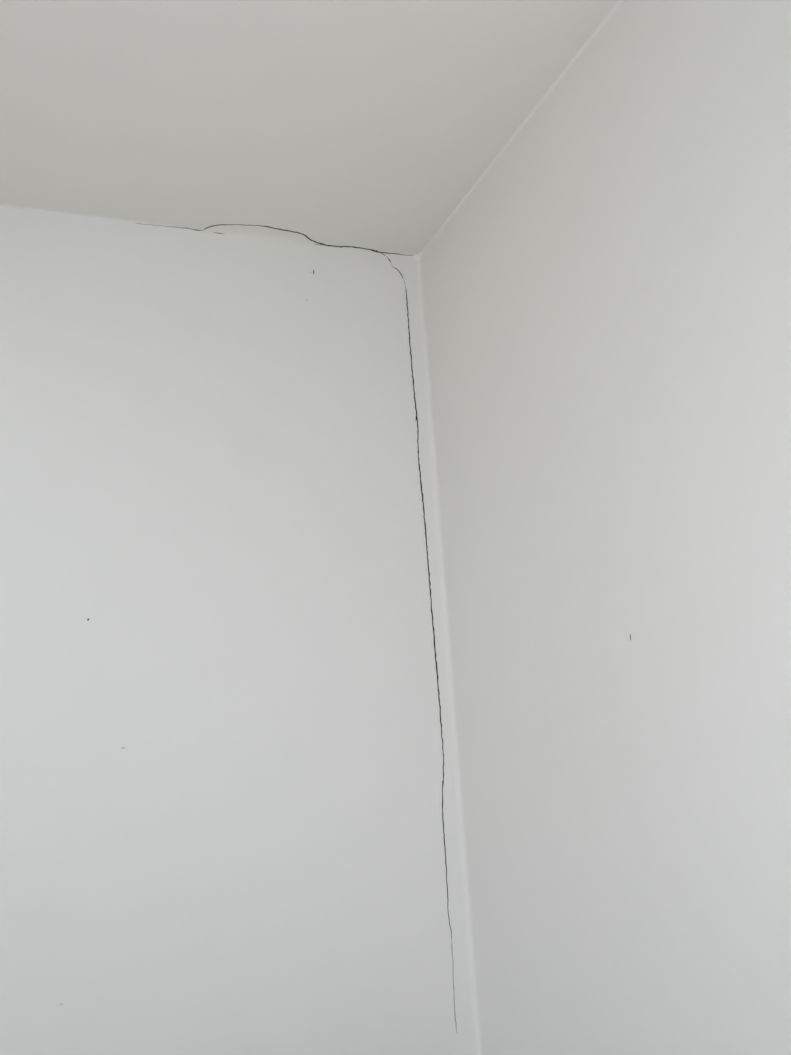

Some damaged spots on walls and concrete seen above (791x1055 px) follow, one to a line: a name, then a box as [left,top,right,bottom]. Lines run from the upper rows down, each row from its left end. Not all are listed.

crack [137,223,457,1031]